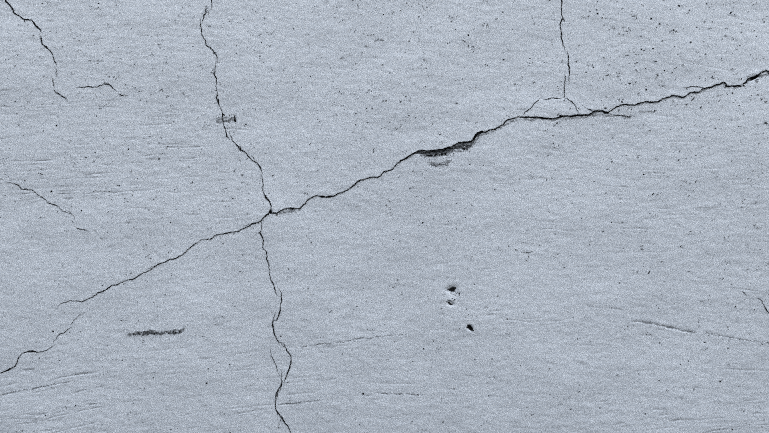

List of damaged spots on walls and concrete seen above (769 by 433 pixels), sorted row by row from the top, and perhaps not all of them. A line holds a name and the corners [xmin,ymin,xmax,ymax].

crack [0,0,468,433]
crack [483,0,769,135]